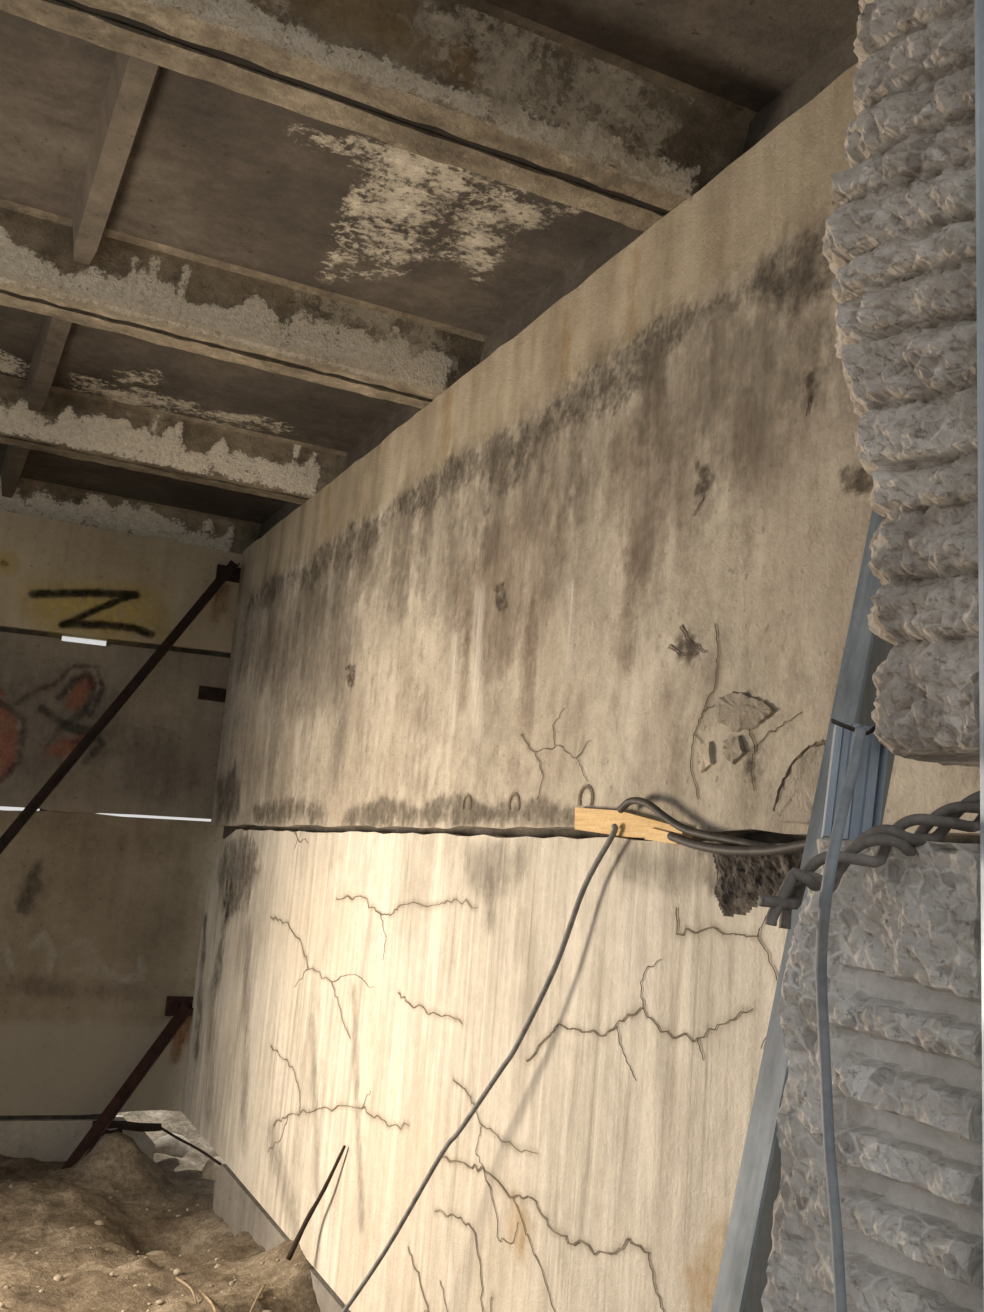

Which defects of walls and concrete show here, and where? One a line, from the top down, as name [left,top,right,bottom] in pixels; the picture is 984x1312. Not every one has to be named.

water stain [144,0,701,200]
water stain [300,128,579,281]
water stain [0,226,458,395]
water stain [0,370,321,496]
water stain [0,476,236,552]
crack [271,917,462,1038]
crack [337,895,478,956]
crack [526,907,778,1081]
spalling [709,842,803,917]
crack [267,1045,409,1153]
crack [435,1080,664,1312]
crack [408,1248,448,1312]